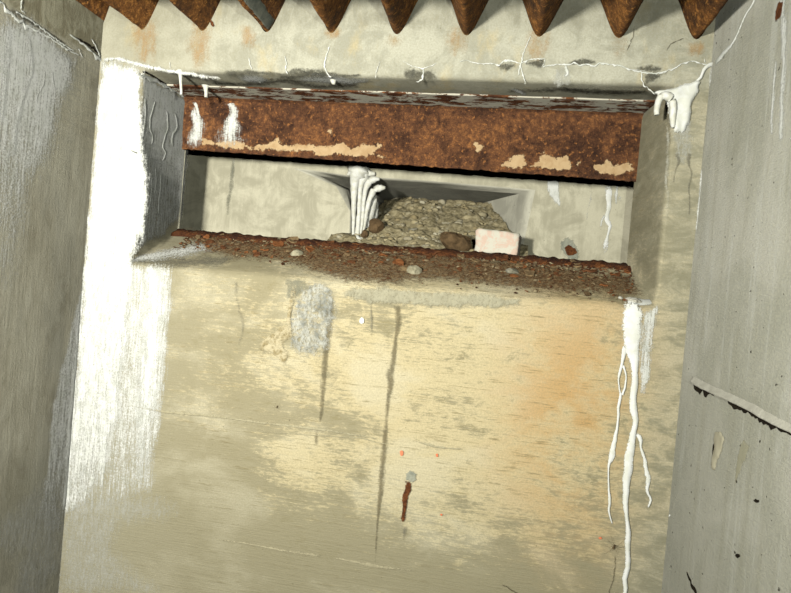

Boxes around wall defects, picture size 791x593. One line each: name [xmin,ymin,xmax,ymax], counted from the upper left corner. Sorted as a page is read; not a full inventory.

crack [0,0,102,61]
crack [460,32,706,94]
water stain [536,0,755,133]
water stain [0,18,76,267]
water stain [601,185,621,249]
water stain [40,57,366,531]
water stain [386,307,400,413]
water stain [375,425,387,549]
rust [401,481,411,534]
water stain [608,298,658,593]